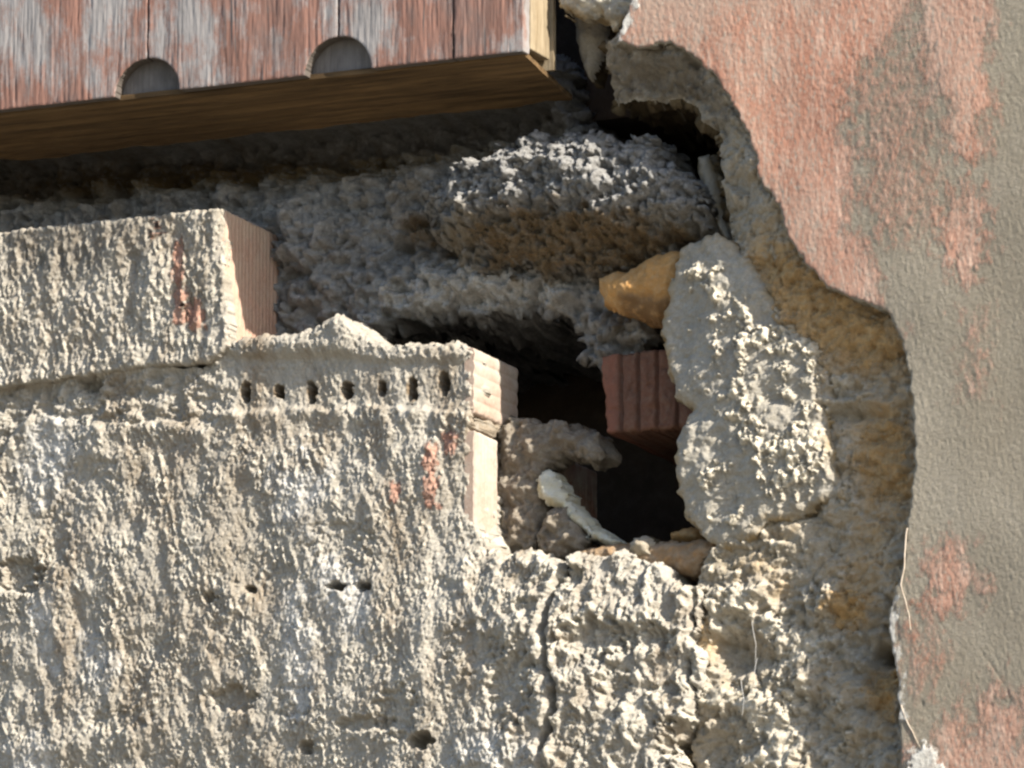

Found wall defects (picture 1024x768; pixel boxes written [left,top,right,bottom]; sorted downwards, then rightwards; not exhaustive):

spalling [597,0,1024,768]